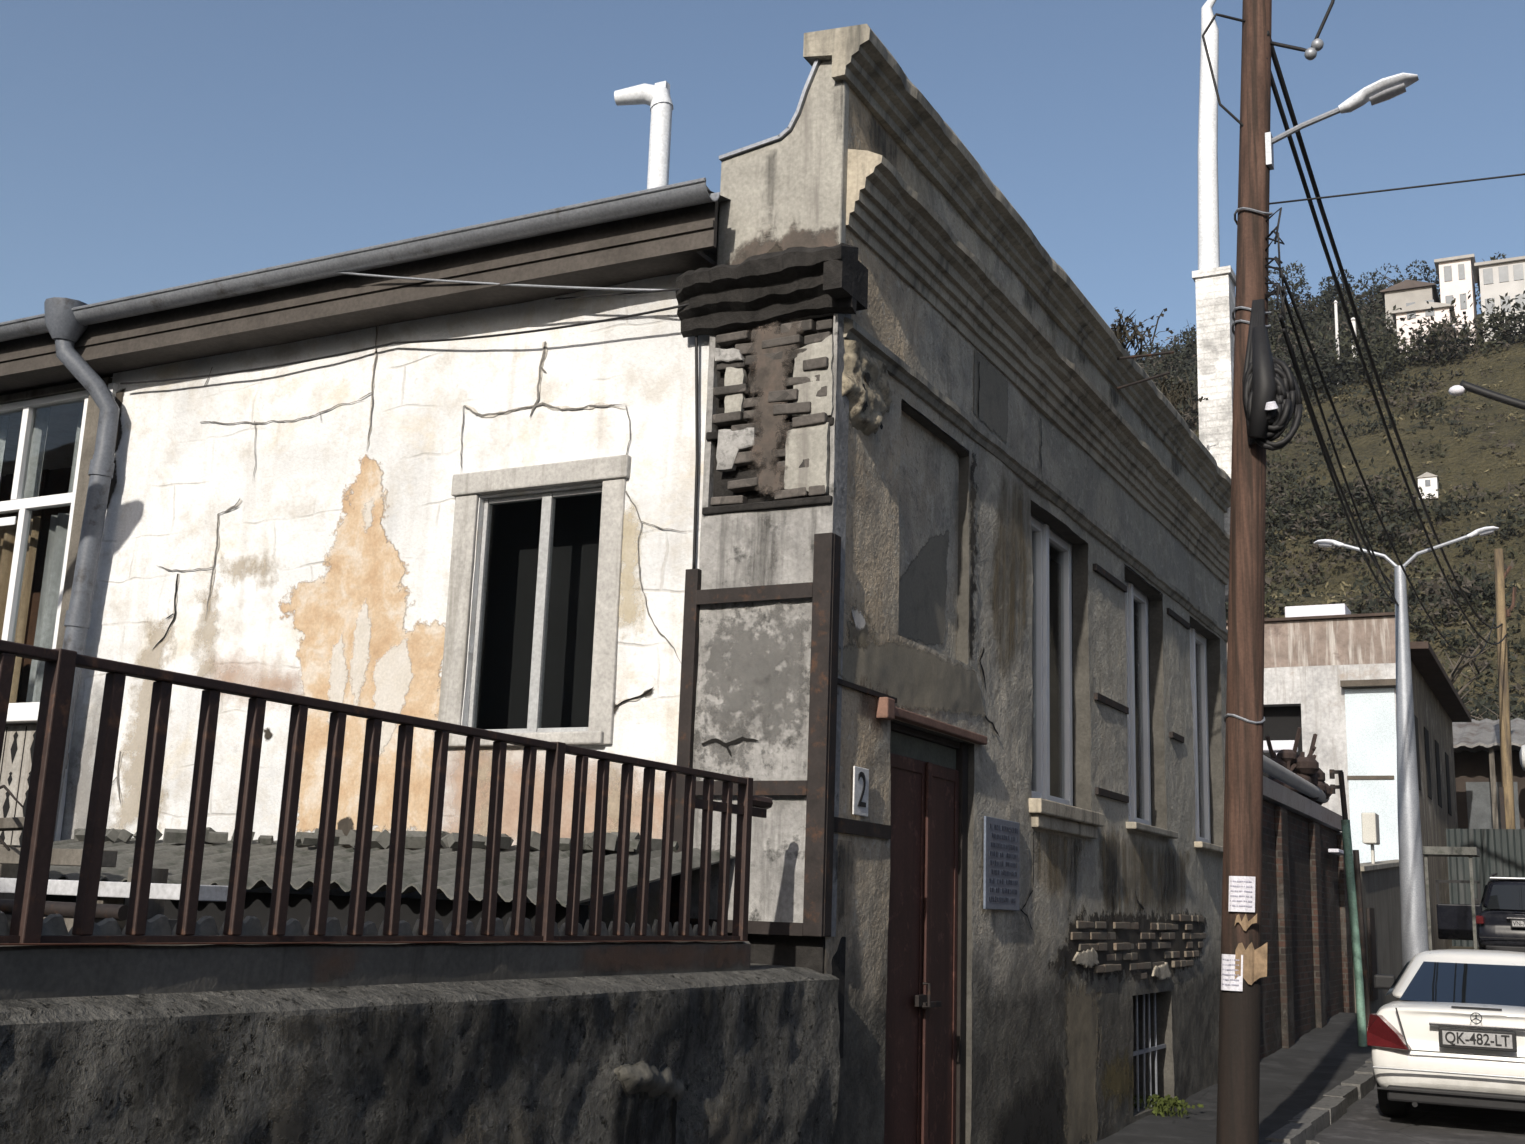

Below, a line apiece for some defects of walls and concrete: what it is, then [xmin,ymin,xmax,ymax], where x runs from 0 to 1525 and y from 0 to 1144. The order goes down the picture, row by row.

crack [152,326,379,649]
peeling [278,454,445,836]
crack [460,341,631,474]
crack [614,687,655,708]
crack [625,491,684,663]
spalling [702,319,834,515]
water stain [998,1062,1065,1144]
flaking render [1048,905,1207,1144]